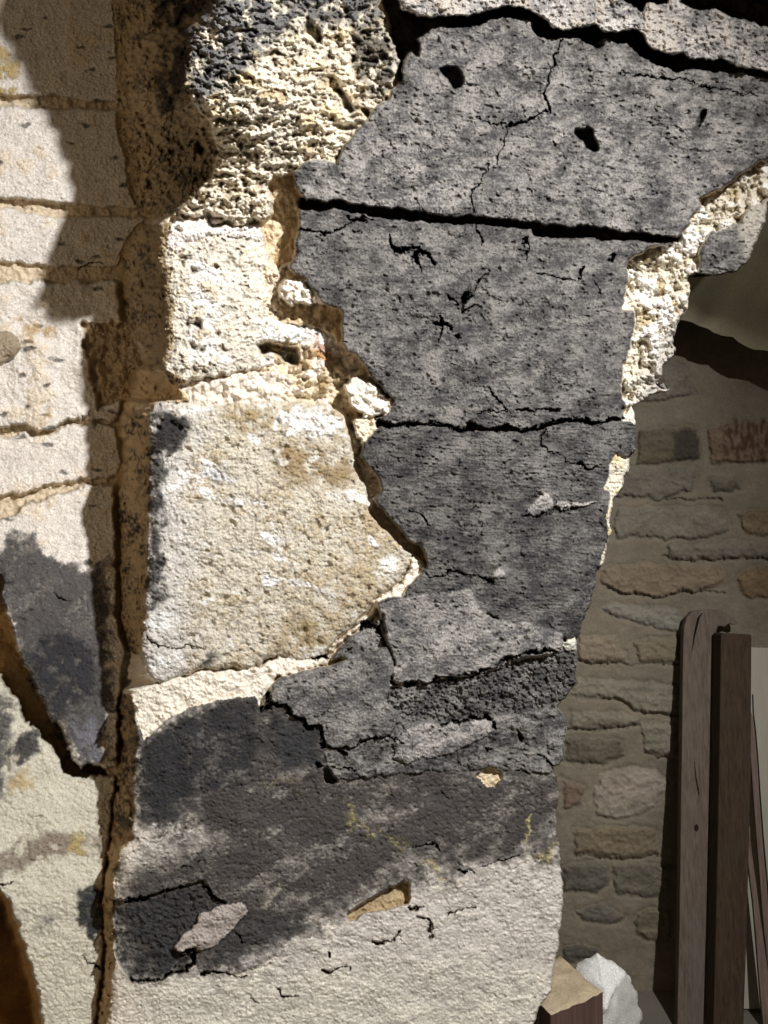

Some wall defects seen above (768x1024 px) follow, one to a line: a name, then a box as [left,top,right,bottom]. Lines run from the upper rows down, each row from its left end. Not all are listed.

crack [618,72,757,97]
crack [470,39,564,246]
spalling [257,341,384,455]
crack [374,387,625,471]
crack [390,647,558,688]
damp [139,703,258,829]
damp [259,716,323,793]
crack [270,692,404,773]
crack [441,714,552,771]
damp [122,890,206,975]
damp [207,883,306,969]